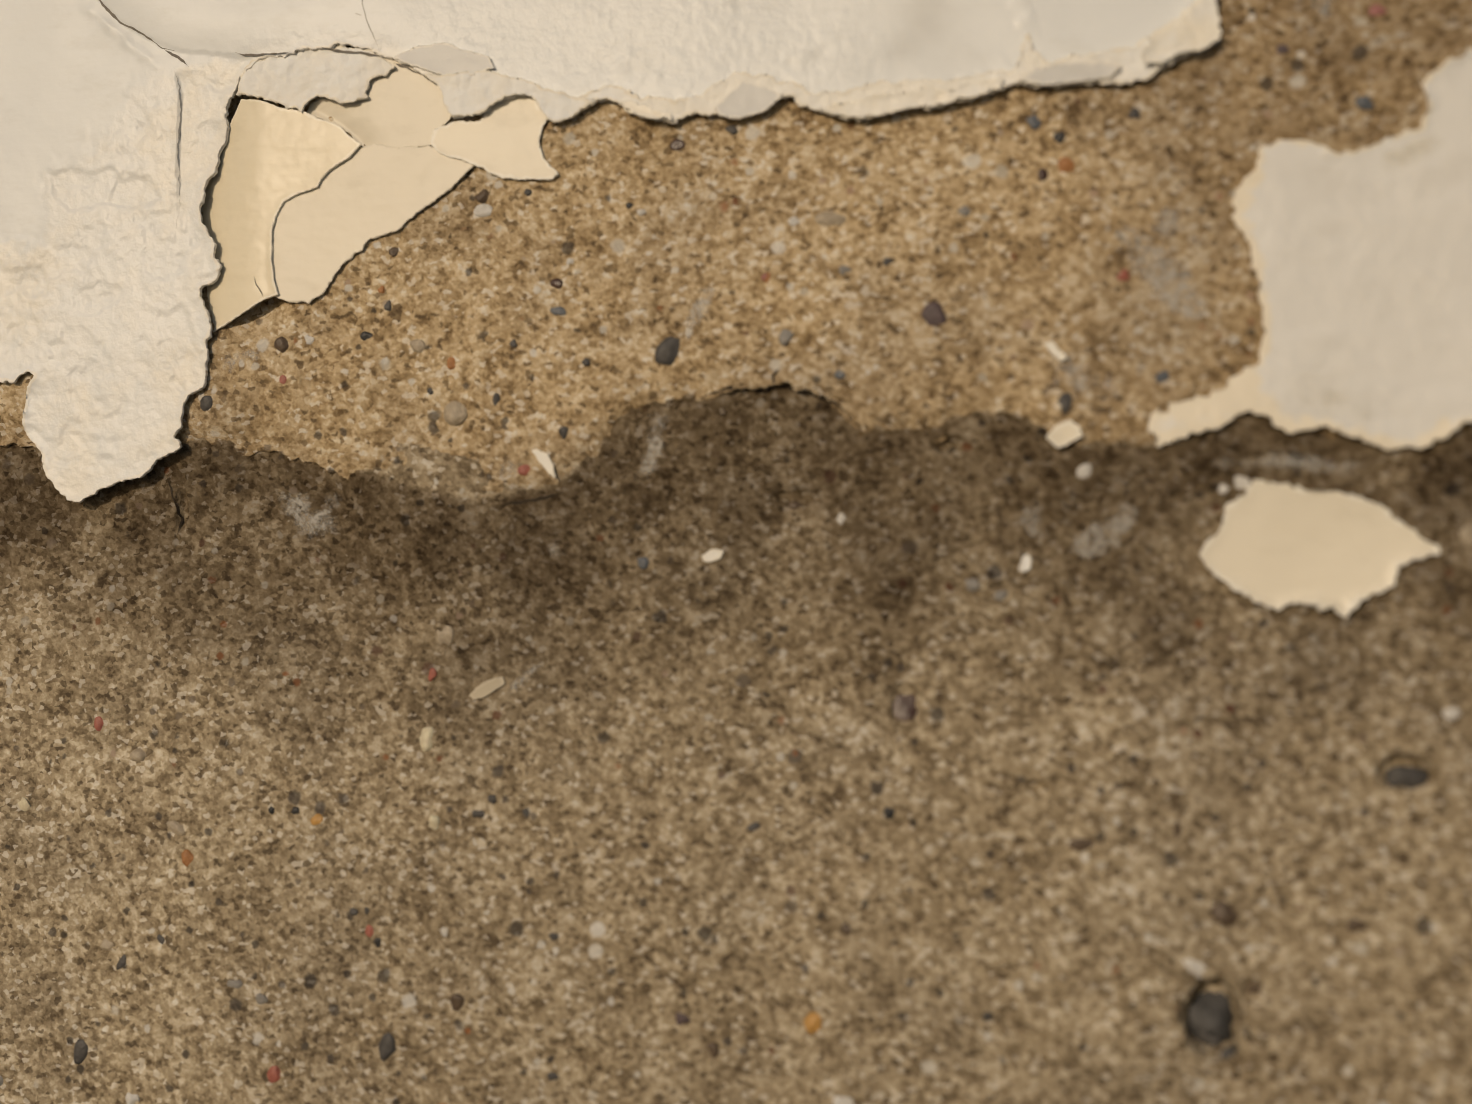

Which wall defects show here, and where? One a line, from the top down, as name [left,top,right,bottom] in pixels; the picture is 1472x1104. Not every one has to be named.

crack [238,0,415,72]
crack [99,0,188,222]
spalling [0,0,1472,503]
peeling [702,549,723,563]
peeling [1019,554,1031,572]
peeling [1200,479,1441,617]